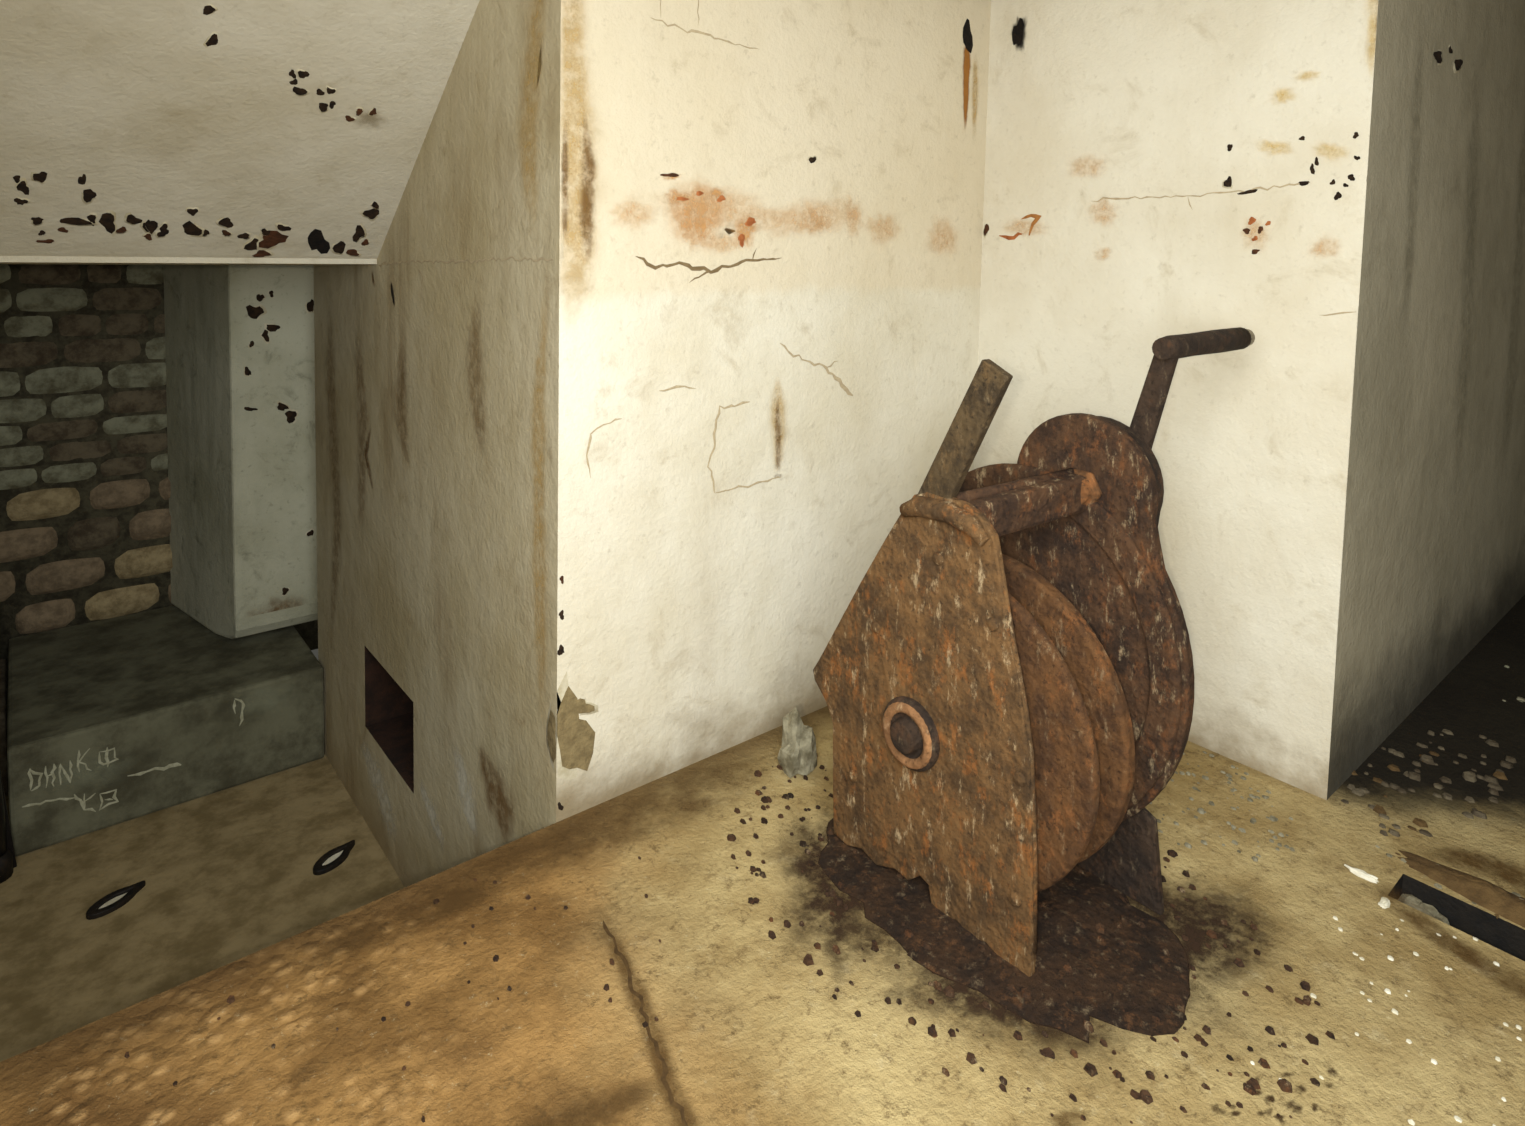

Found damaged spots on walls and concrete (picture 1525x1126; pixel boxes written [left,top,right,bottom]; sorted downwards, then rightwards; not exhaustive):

rust [963,19,977,122]
peeling [13,172,291,257]
peeling [308,201,380,257]
water stain [563,22,594,245]
rust [660,173,726,238]
crack [636,248,780,283]
rust [737,217,756,248]
peeling [1299,132,1367,200]
crack [780,343,853,396]
crack [659,385,781,493]
spalling [546,672,599,780]
crack [603,921,694,1126]